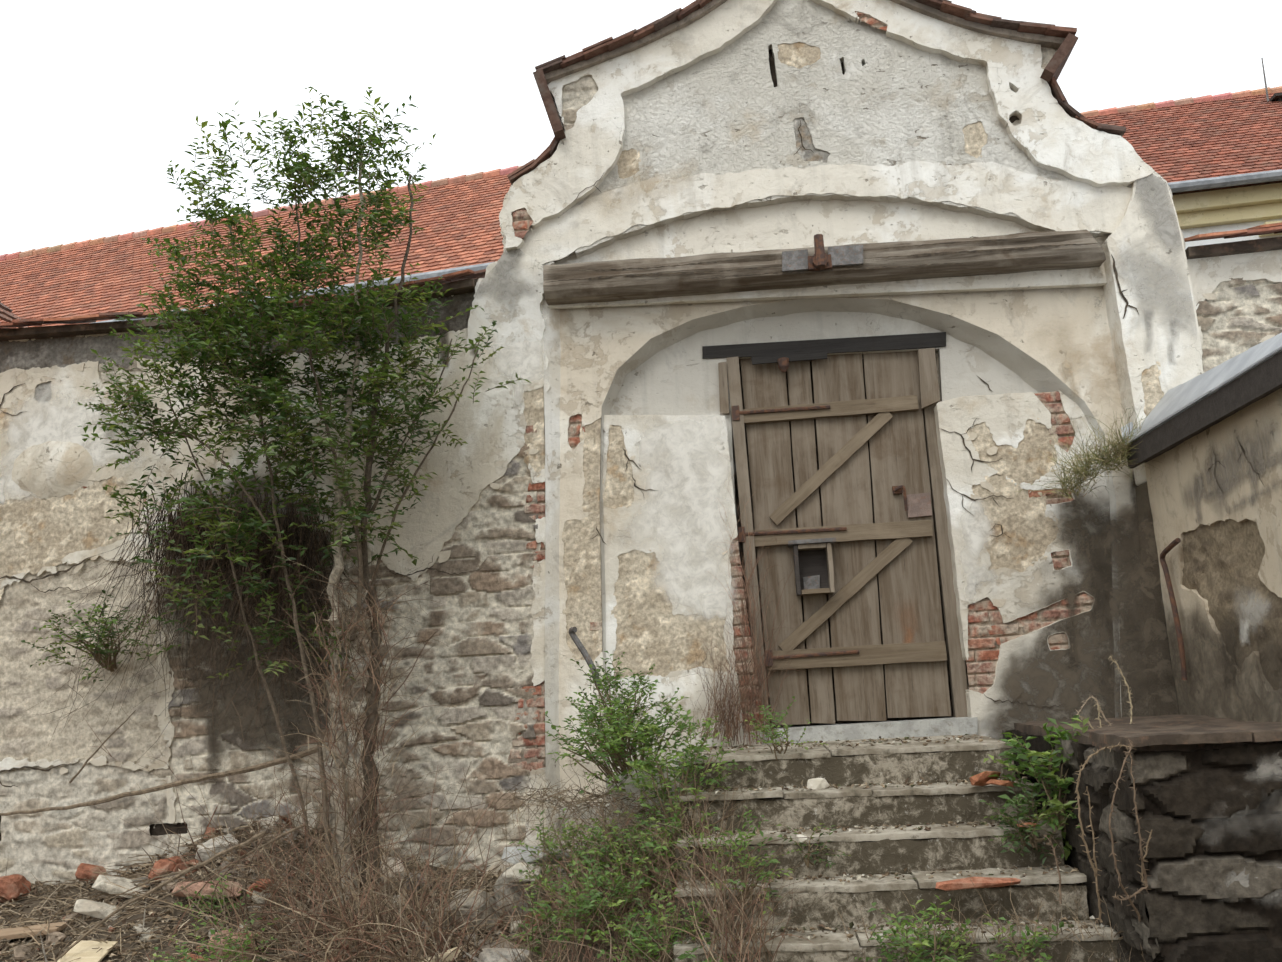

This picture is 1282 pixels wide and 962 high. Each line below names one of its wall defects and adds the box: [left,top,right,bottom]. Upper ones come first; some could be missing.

flaking render [512,209,533,239]
crack [1111,254,1139,319]
flaking render [1196,278,1282,372]
crack [623,449,658,496]
crack [939,418,1011,538]
flaking render [965,391,1075,572]
crack [0,557,89,593]
flaking render [0,387,546,885]
flaking render [562,414,766,732]
flaking render [966,592,1093,694]
water stain [990,474,1282,742]
crack [0,763,71,787]